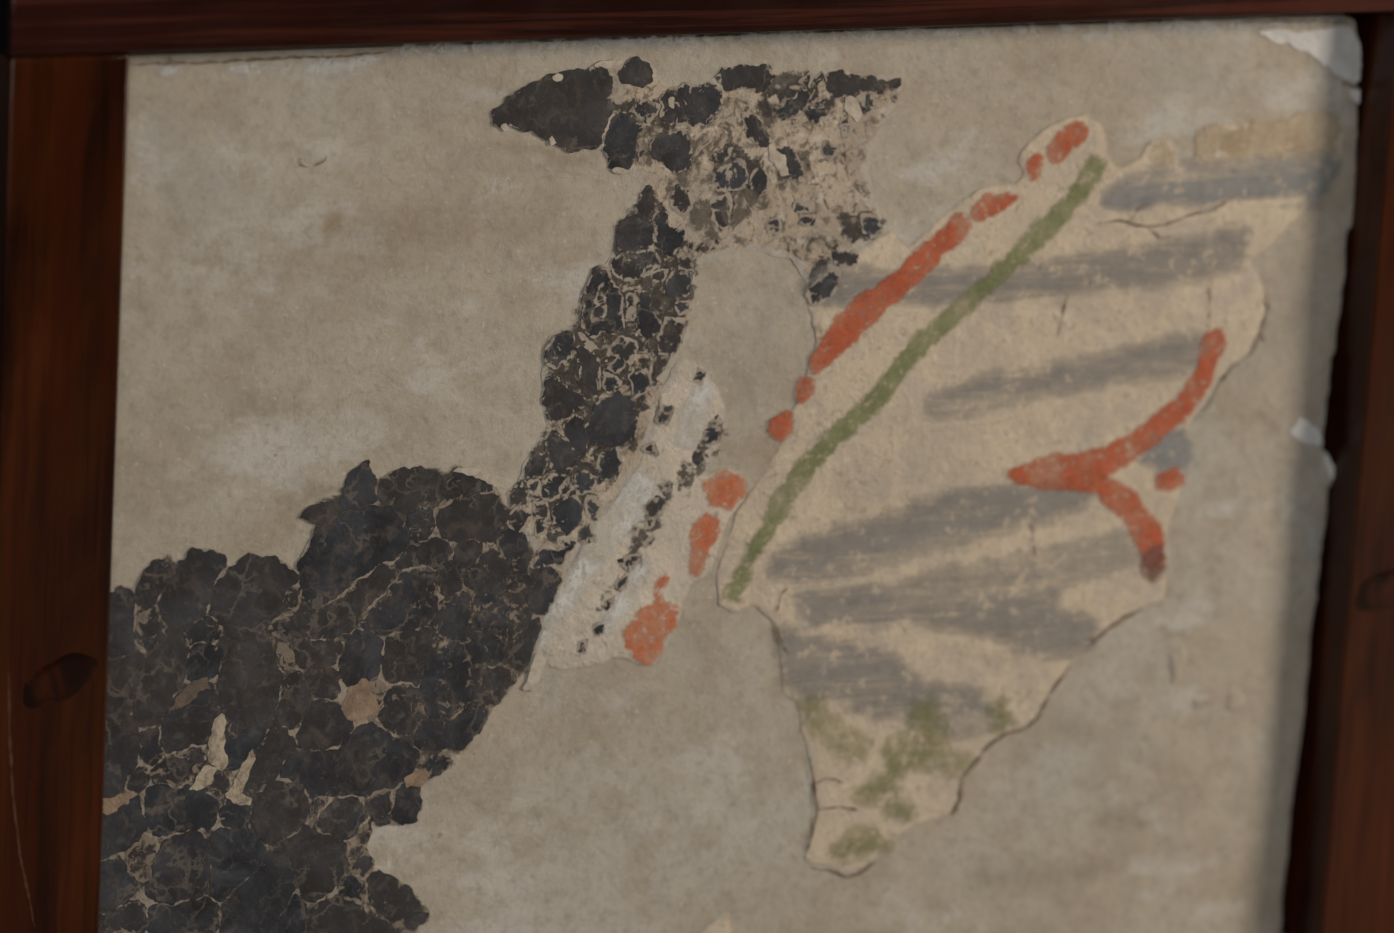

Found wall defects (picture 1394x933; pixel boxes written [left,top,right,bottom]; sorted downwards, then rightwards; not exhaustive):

spalling [394,43,514,55]
spalling [537,36,765,49]
spalling [849,30,989,40]
spalling [1161,19,1362,103]
crack [1104,198,1231,240]
spalling [1289,417,1334,479]
crack [952,608,1145,816]
crack [805,757,877,878]